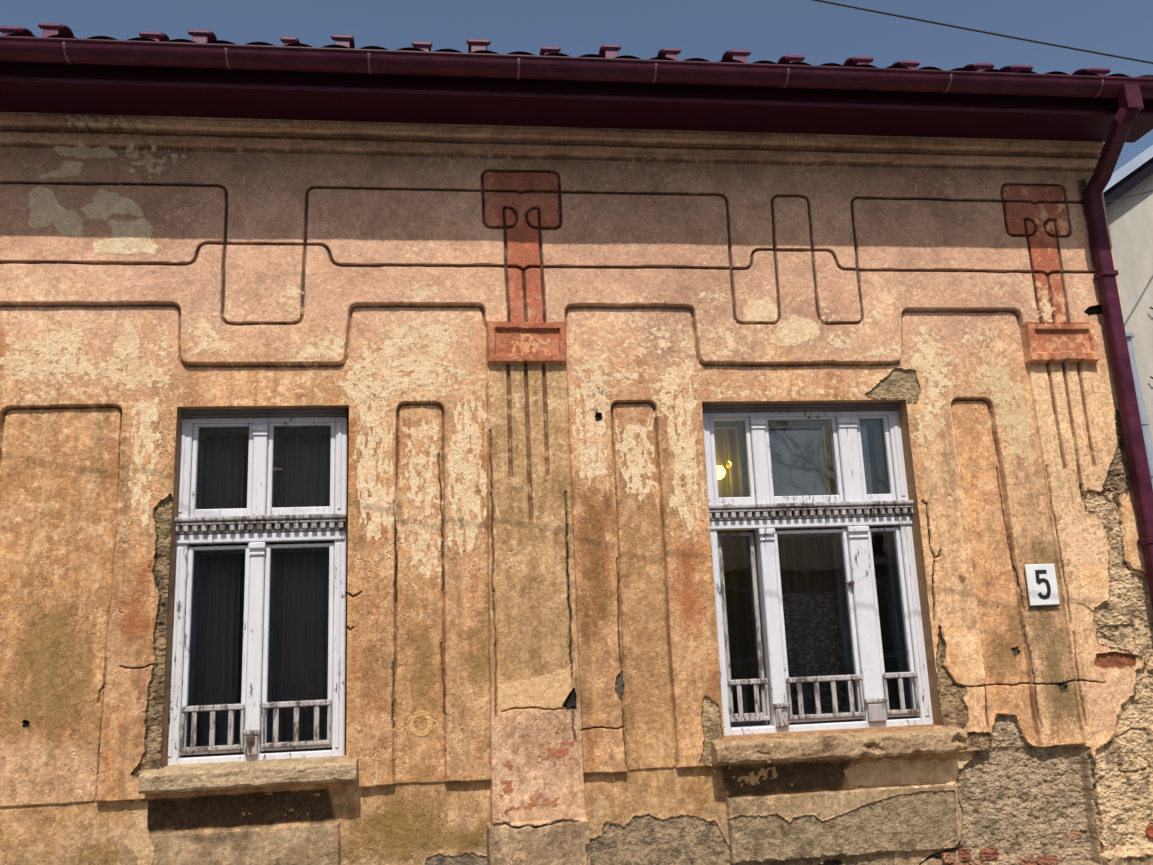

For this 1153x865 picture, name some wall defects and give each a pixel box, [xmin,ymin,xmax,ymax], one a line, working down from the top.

peeling [28,115,186,255]
peeling [187,316,235,355]
peeling [402,283,438,306]
peeling [287,315,499,589]
peeling [568,322,961,539]
peeling [0,317,175,776]
crack [922,501,940,611]
crack [968,468,1104,728]
peeling [125,801,154,865]
spalling [425,852,491,865]